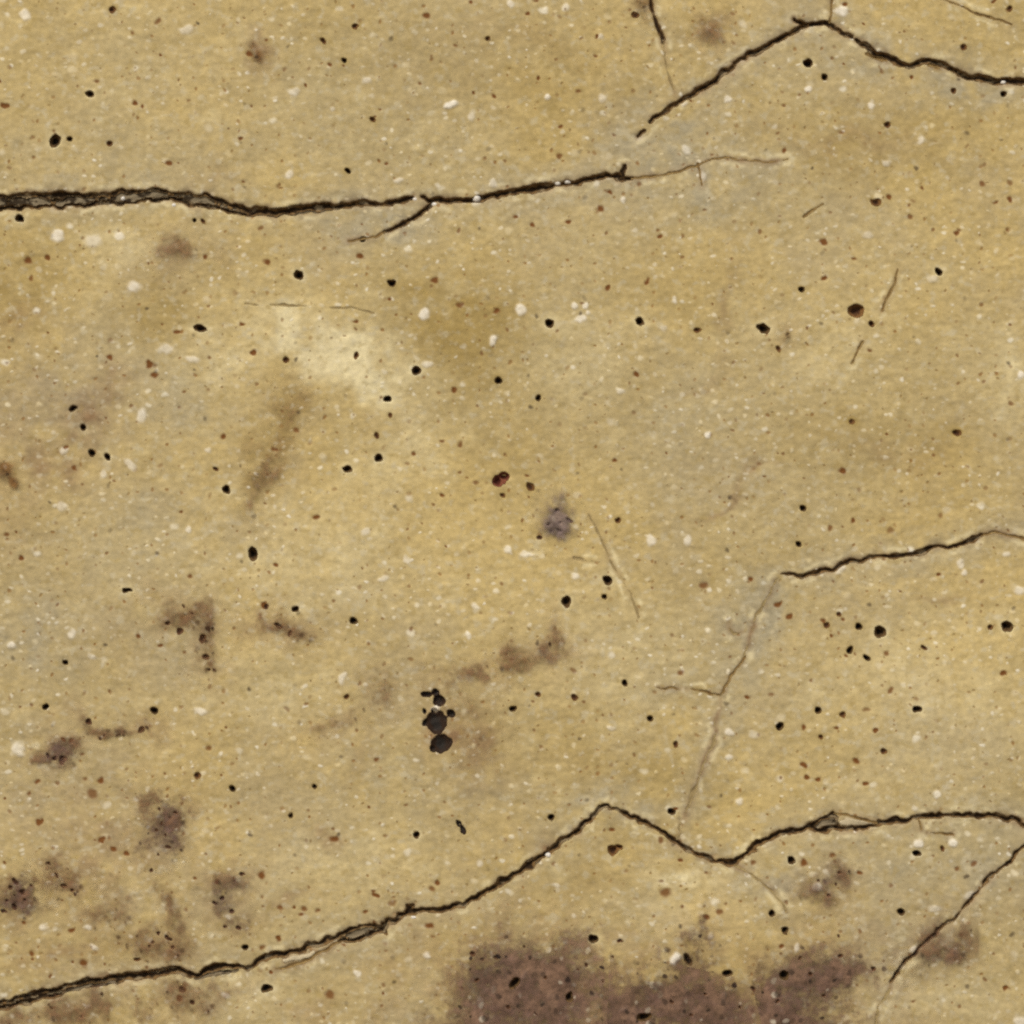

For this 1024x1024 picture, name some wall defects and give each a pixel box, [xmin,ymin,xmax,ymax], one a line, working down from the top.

crack [637,0,1024,138]
crack [0,156,788,242]
crack [0,530,1024,1024]
leakage [448,931,885,1024]